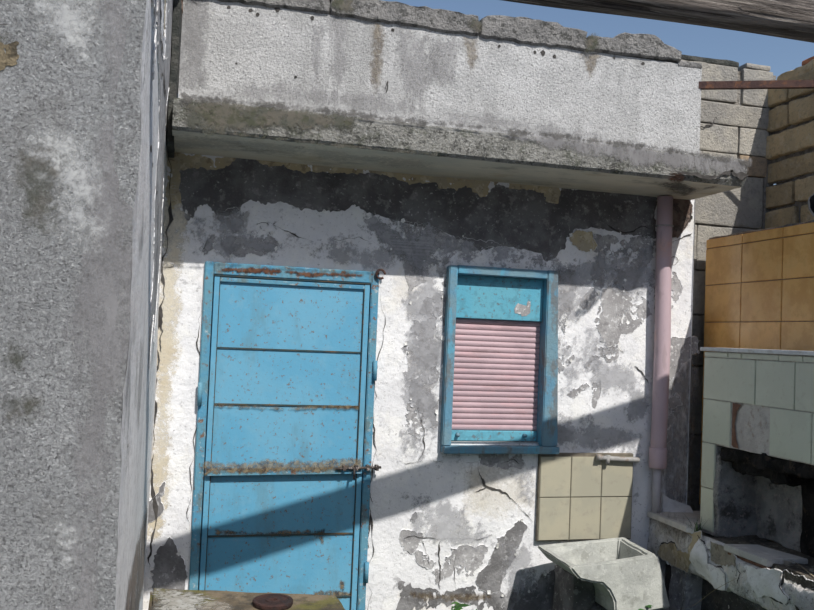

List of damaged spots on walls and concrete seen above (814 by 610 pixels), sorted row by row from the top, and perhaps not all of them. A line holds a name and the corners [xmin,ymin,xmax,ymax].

flaking render [149,0,657,440]
flaking render [672,198,694,240]
crack [147,10,174,564]
corrosion [222,267,362,277]
peeling [671,271,683,309]
peeling [669,336,700,382]
peeling [732,403,741,449]
corrosion [203,458,362,476]
crack [473,469,532,521]
leakage [126,507,229,610]
flaking render [396,511,555,610]
flaking render [656,530,814,606]